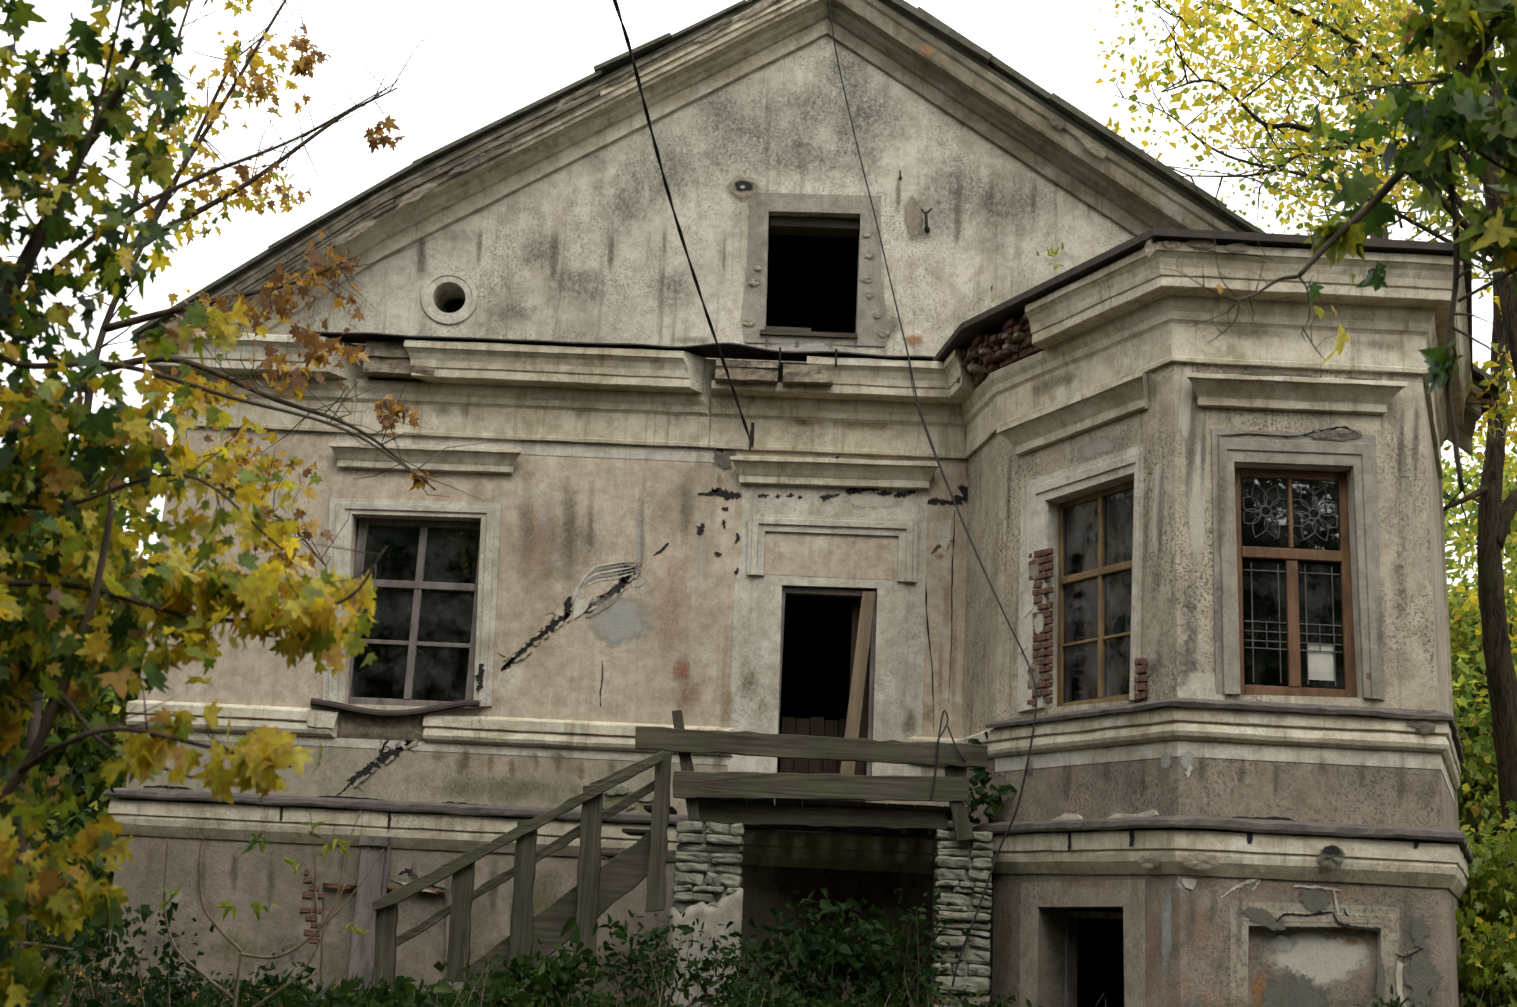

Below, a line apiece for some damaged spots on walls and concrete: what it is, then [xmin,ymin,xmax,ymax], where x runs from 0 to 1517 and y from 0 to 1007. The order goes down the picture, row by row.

water stain [935,172,964,237]
flaking render [956,314,1044,389]
spalling [695,449,968,558]
crack [474,543,669,691]
peeling [572,560,649,647]
flaking render [1019,548,1054,706]
flaking render [1132,658,1155,701]
peeling [1176,672,1226,700]
crack [144,783,190,791]
crack [317,739,418,800]
peeling [1221,878,1443,1007]